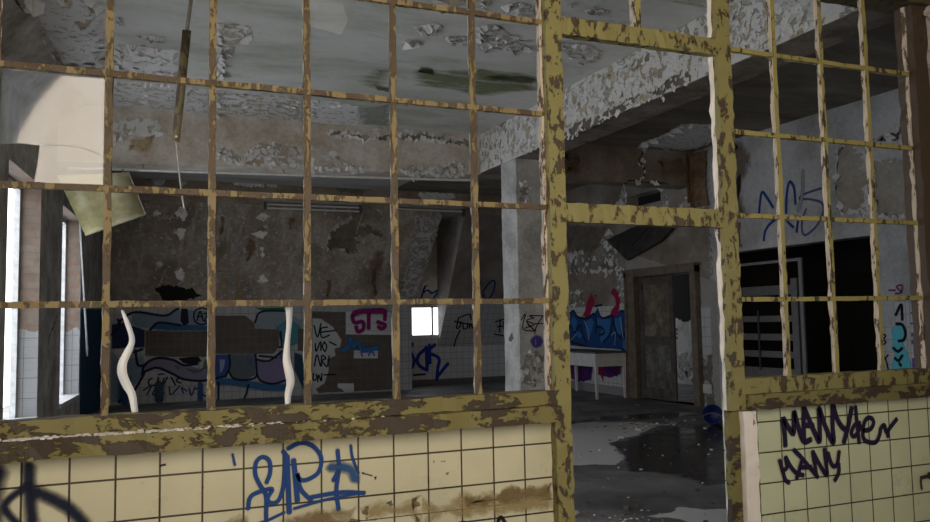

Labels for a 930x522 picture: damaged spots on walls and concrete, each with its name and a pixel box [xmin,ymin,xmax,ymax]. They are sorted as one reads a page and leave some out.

peeling [402,23,531,56]
peeling [729,0,815,55]
peeling [922,6,930,68]
peeling [23,0,469,147]
mould [418,68,535,95]
peeling [562,42,691,140]
peeling [216,141,365,175]
peeling [482,116,539,166]
peeling [637,123,712,151]
peeling [832,145,906,219]
flaking render [325,216,384,256]
peeling [566,224,624,308]